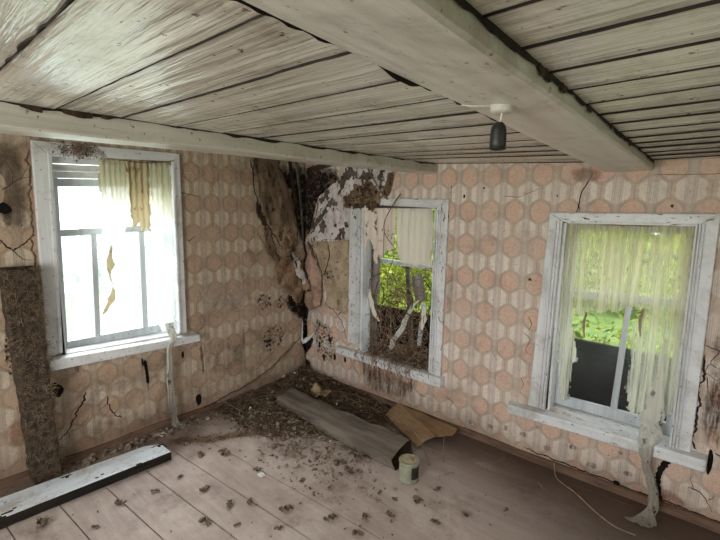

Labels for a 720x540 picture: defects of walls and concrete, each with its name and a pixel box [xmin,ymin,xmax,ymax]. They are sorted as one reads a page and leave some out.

crack [0,136,37,265]
peeling [281,161,394,313]
water stain [255,292,335,361]
crack [60,392,122,442]
crack [692,345,720,449]
crack [522,446,720,523]